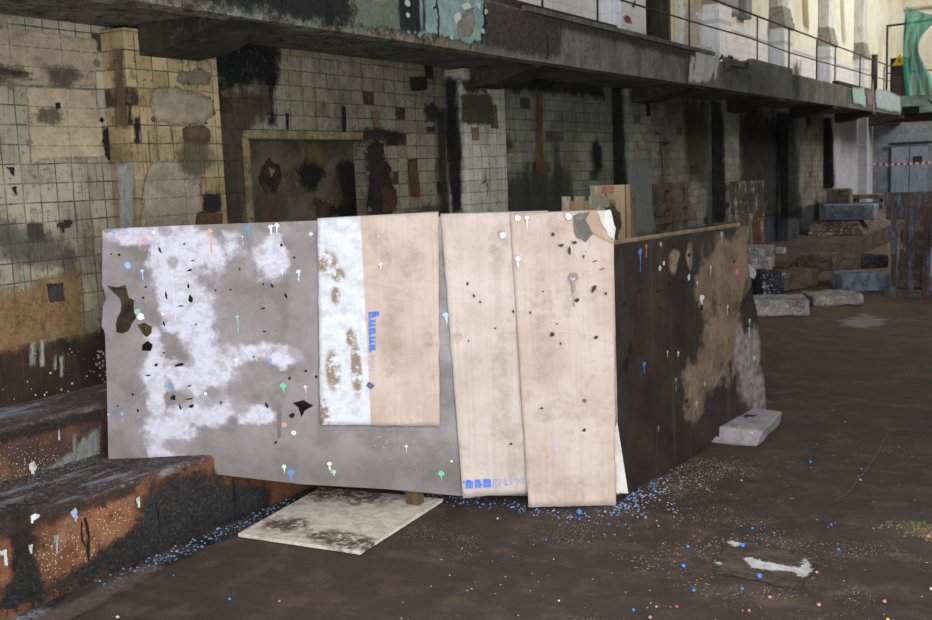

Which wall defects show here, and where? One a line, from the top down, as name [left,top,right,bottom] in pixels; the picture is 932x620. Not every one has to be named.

peeling [355,0,488,44]
peeling [139,158,202,227]